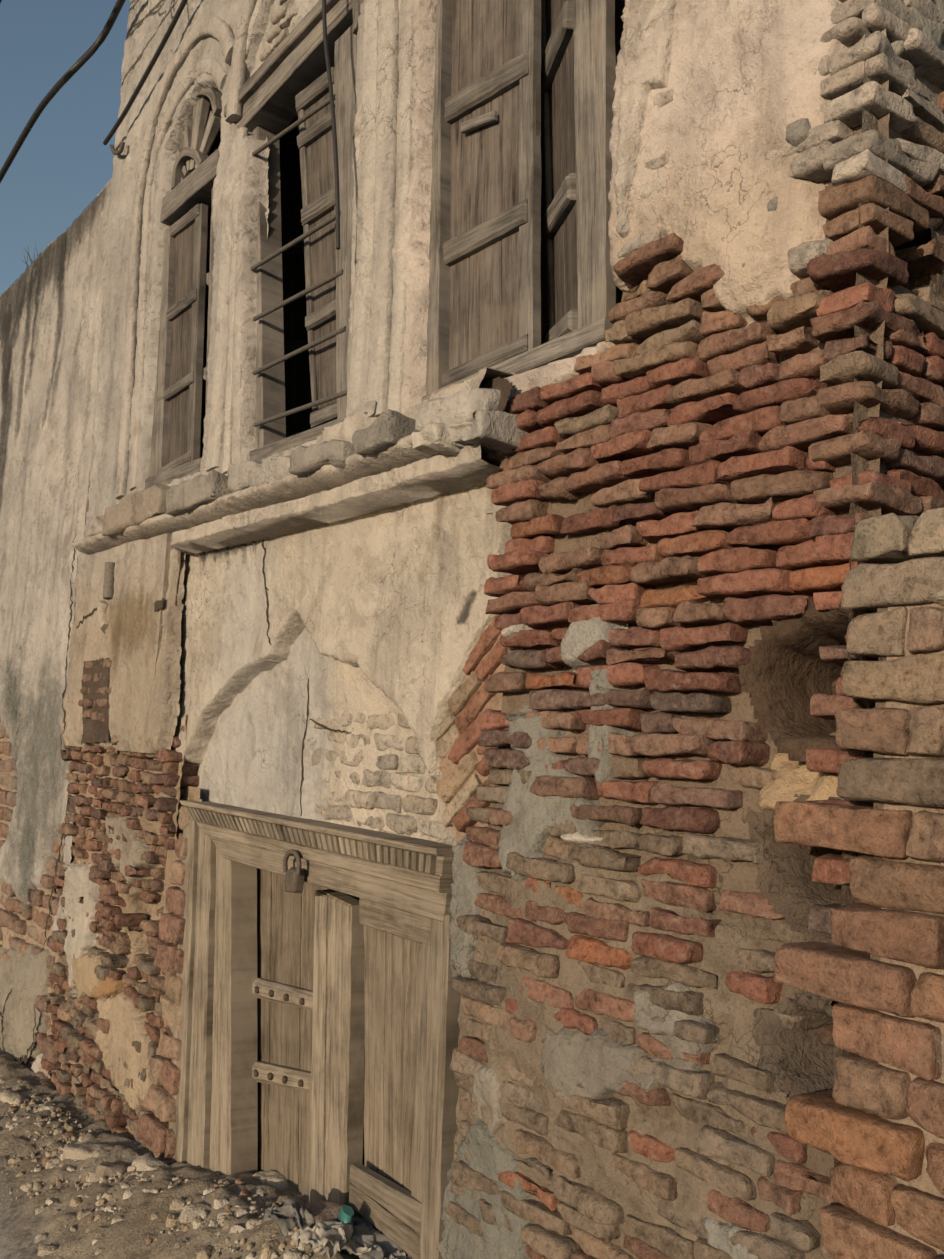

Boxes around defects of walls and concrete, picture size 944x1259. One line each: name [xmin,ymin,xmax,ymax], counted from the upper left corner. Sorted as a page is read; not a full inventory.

flaking render [639,151,670,200]
flaking render [646,88,674,113]
peeling [767,196,778,211]
spalling [760,0,944,193]
damp [0,187,105,505]
crack [262,539,271,645]
damp [4,665,65,909]
crack [300,678,350,814]
flaking render [102,203,915,1259]
flaking render [0,658,200,1148]